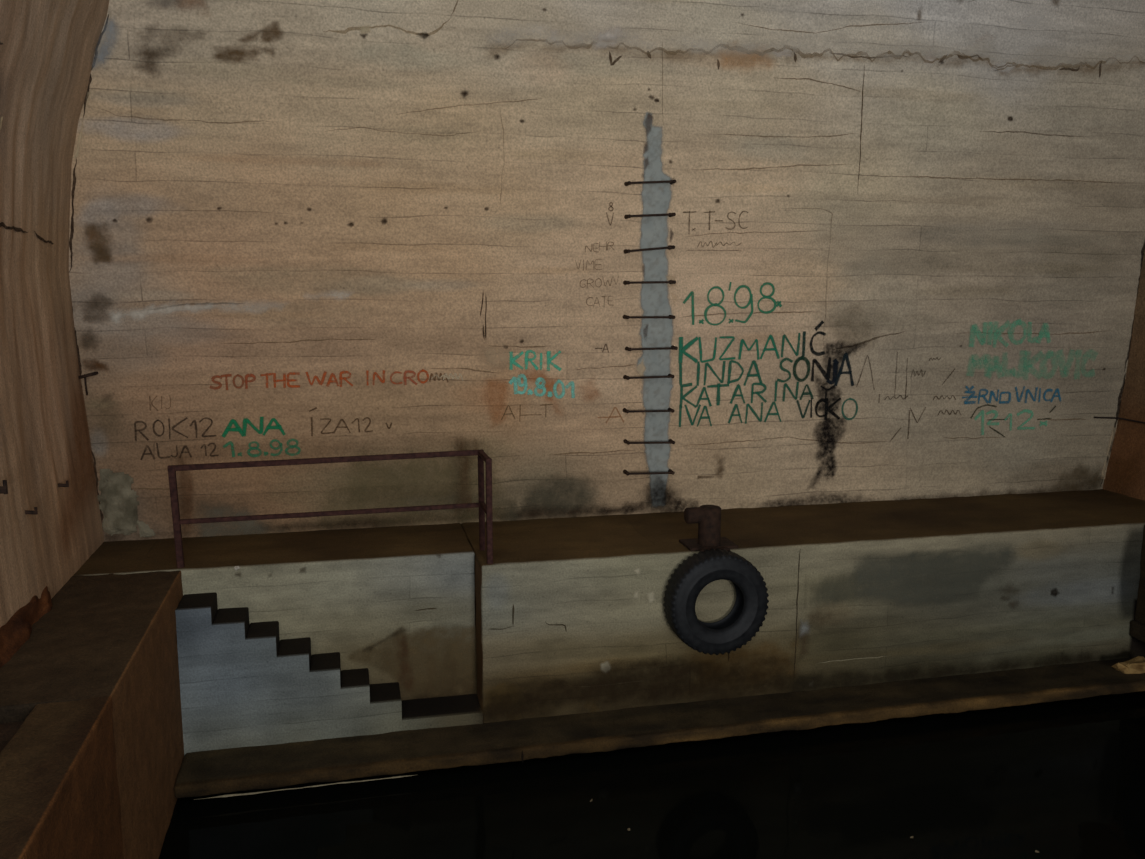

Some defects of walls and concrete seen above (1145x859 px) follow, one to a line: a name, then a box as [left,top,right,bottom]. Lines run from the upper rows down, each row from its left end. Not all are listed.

crack [0,14,109,272]
crack [490,22,1143,194]
crack [72,307,82,387]
leakage [813,343,860,485]
crack [834,333,898,350]
crack [1100,242,1145,487]
crack [92,452,104,528]